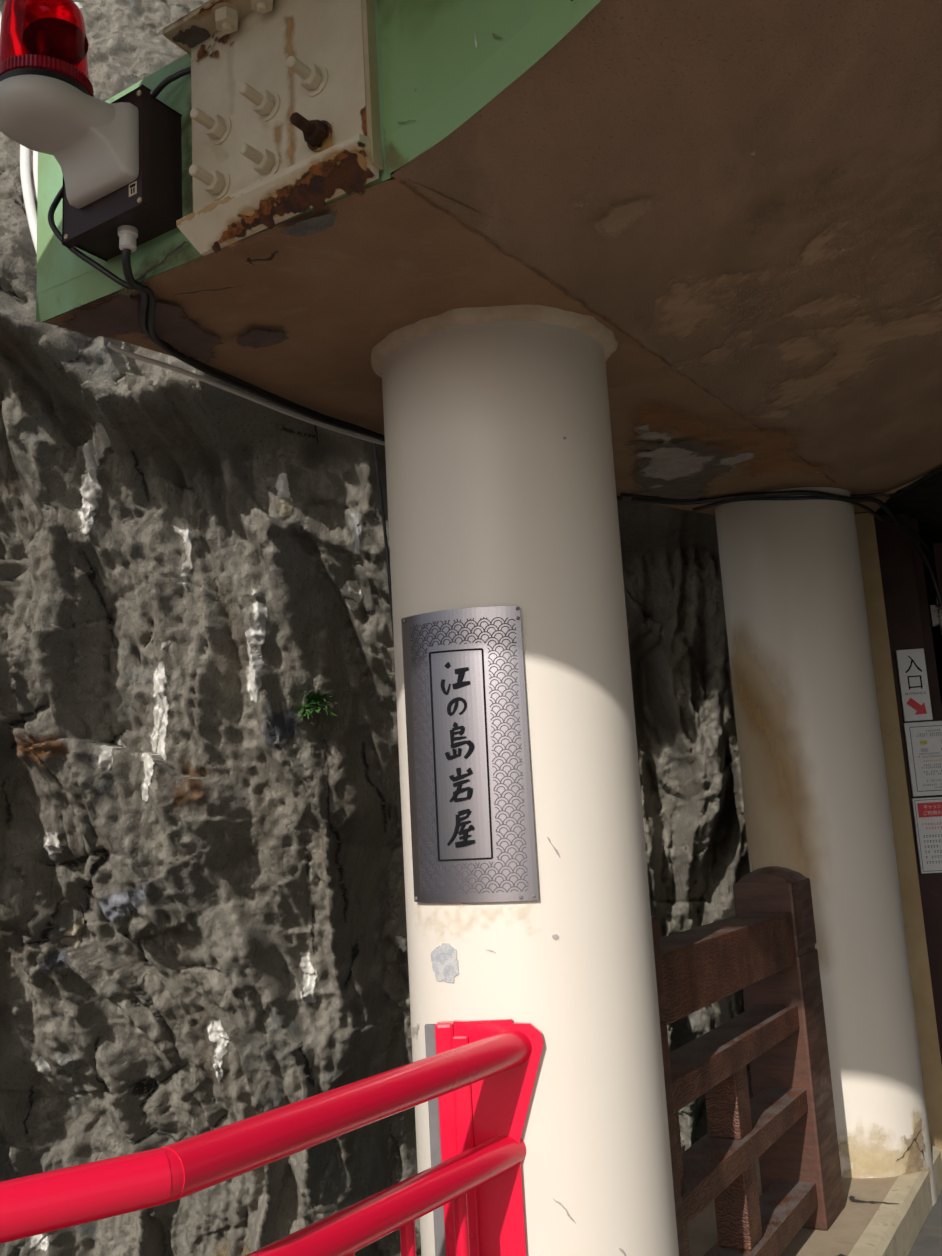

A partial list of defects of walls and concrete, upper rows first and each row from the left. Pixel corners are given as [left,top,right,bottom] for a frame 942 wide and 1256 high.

corrosion [196,32,234,62]
corrosion [212,105,374,253]
peeling [58,293,288,362]
spalling [628,440,748,499]
peeling [431,943,459,983]
damp [839,1115,930,1178]